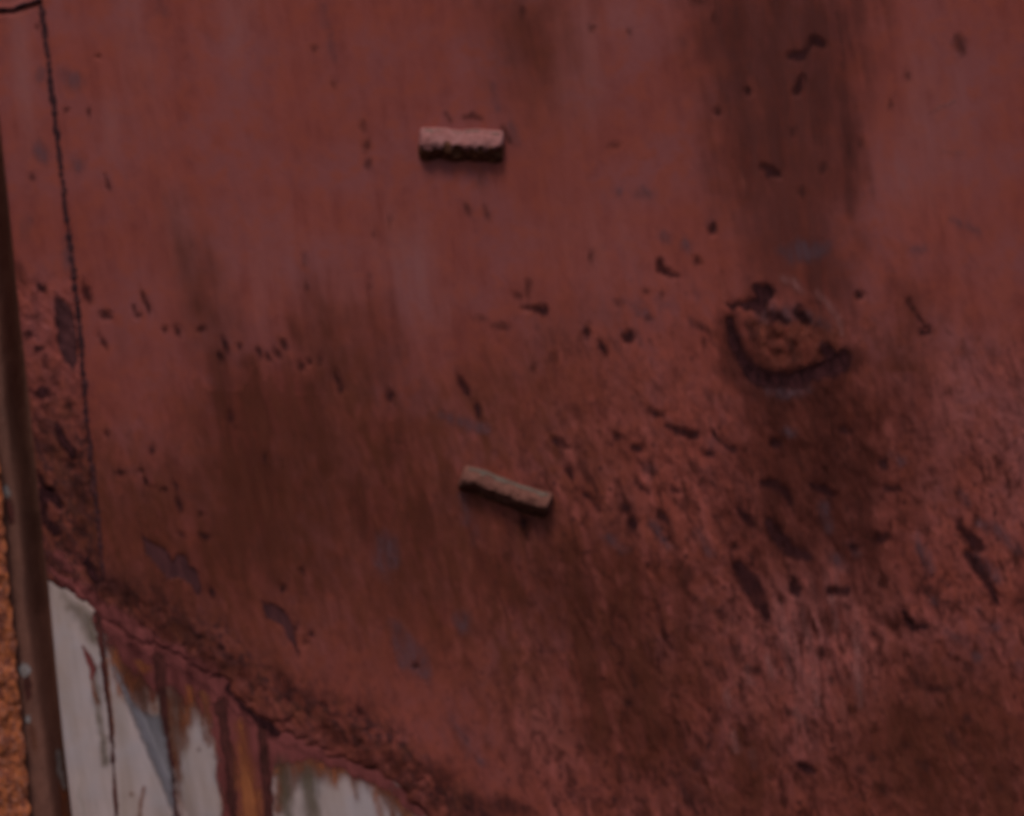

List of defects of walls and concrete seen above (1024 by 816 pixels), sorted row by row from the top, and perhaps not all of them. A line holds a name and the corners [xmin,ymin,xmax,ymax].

rust [723,279,863,401]
rust [48,549,425,816]
peeling [261,600,313,658]